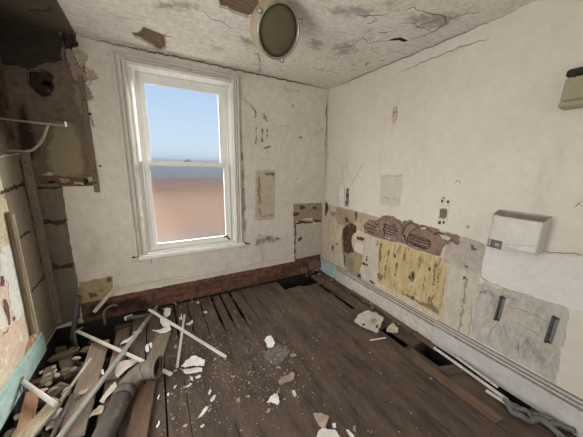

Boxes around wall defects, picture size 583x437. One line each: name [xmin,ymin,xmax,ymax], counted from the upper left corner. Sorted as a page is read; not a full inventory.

flaking render [131,26,168,51]
crack [80,5,518,151]
flaking render [0,0,113,391]
flaking render [255,170,276,221]
flaking render [437,197,450,226]
flaking render [80,204,569,387]
leakage [406,259,441,313]